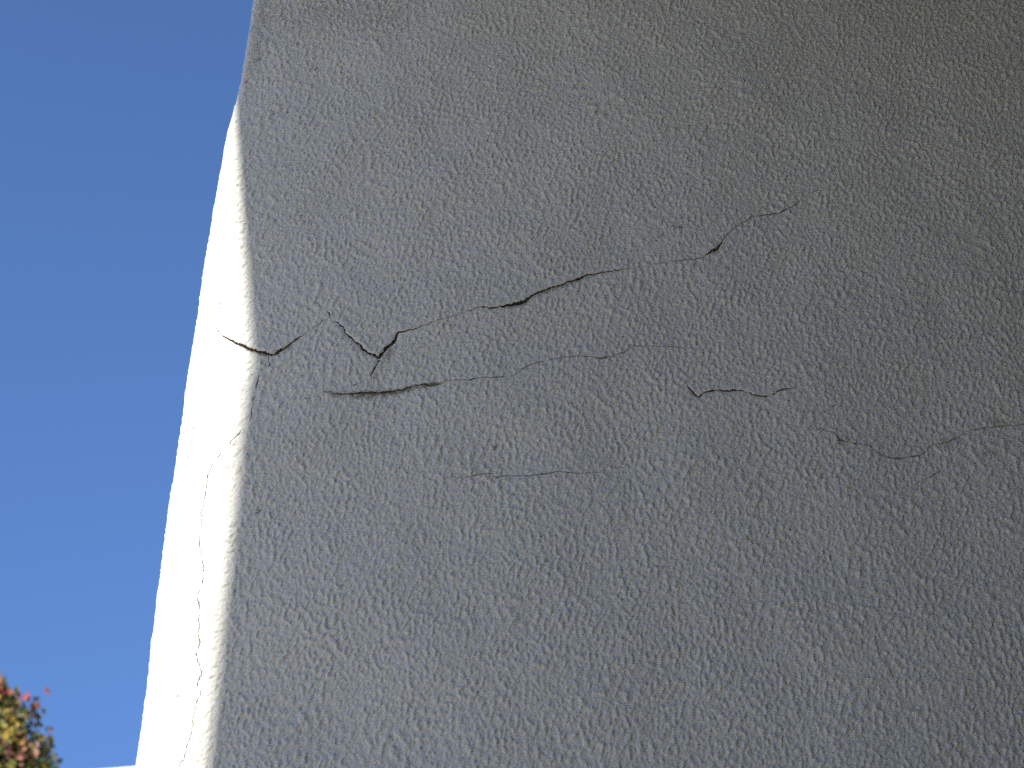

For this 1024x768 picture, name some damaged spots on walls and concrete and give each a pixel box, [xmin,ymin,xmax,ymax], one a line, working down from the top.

crack [179,190,817,767]
crack [813,404,1024,477]